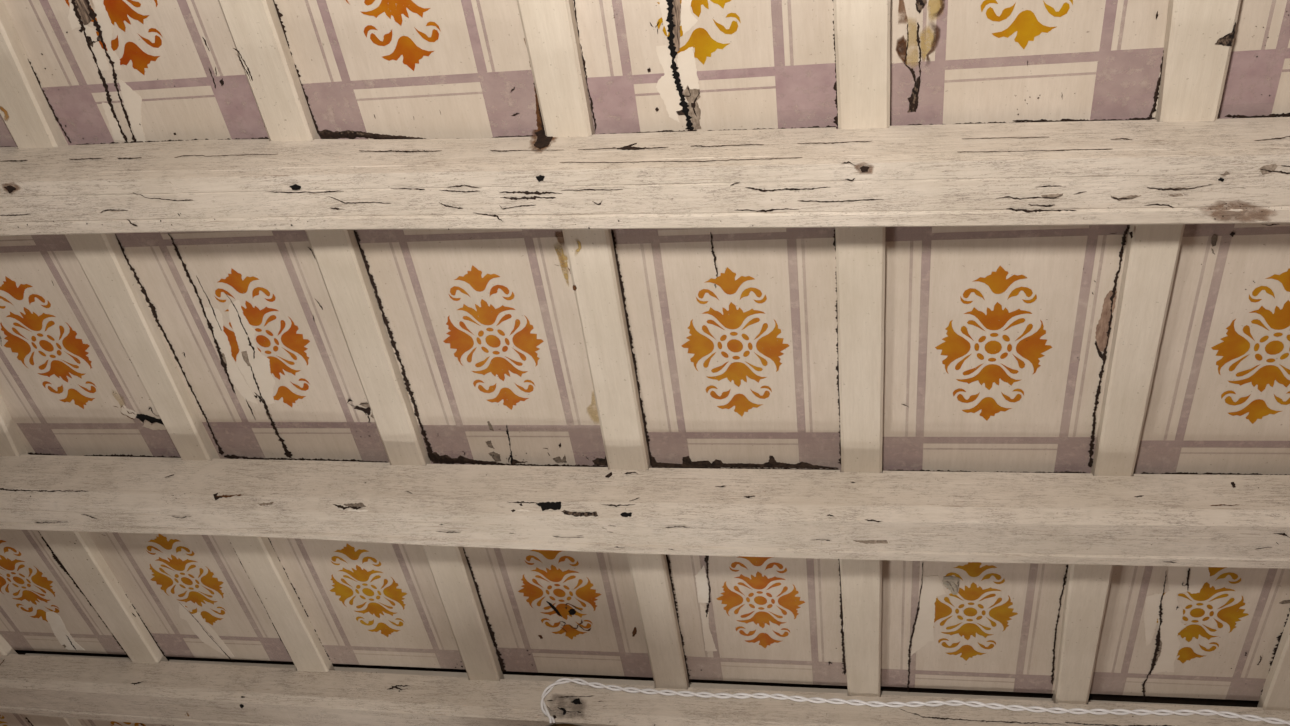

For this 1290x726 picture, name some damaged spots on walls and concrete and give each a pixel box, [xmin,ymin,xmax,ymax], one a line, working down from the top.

crack [71,0,141,160]
crack [268,0,884,222]
crack [904,23,921,112]
crack [174,152,275,160]
crack [101,193,292,458]
crack [554,504,635,548]
crack [816,537,888,545]
peeling [911,612,931,656]
crack [901,544,1190,726]